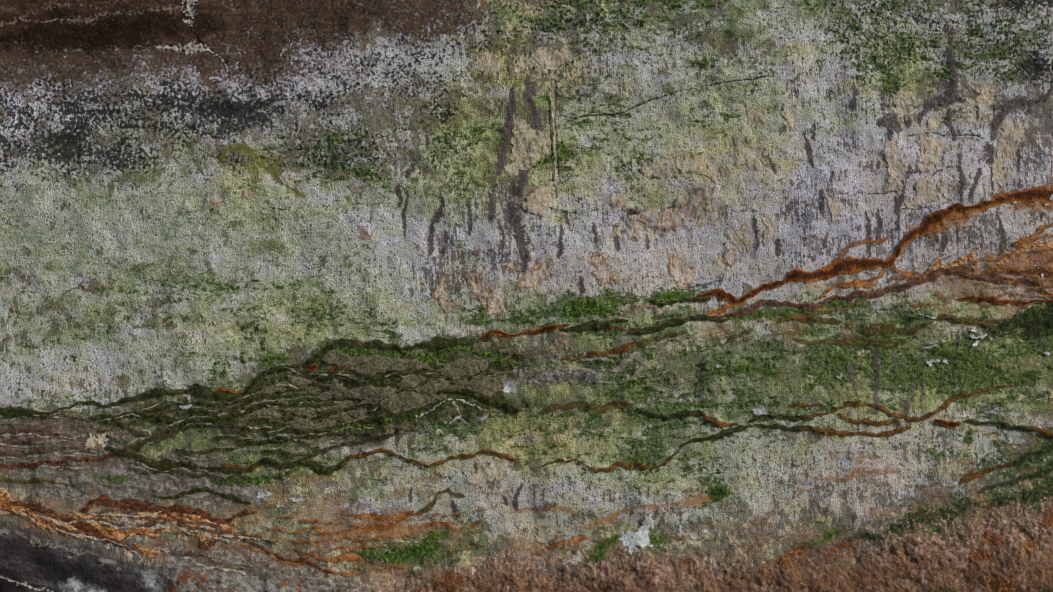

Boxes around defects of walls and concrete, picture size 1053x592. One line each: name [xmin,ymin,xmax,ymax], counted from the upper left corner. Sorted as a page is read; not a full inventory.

damp [0,0,496,129]
damp [395,127,431,240]
damp [426,196,449,257]
damp [488,74,545,271]
damp [557,210,569,259]
rust [481,183,1053,340]
damp [803,122,817,168]
damp [927,220,961,269]
damp [865,23,1053,257]
rust [538,385,1053,473]
rust [0,424,519,592]
efflorescence [63,578,106,592]